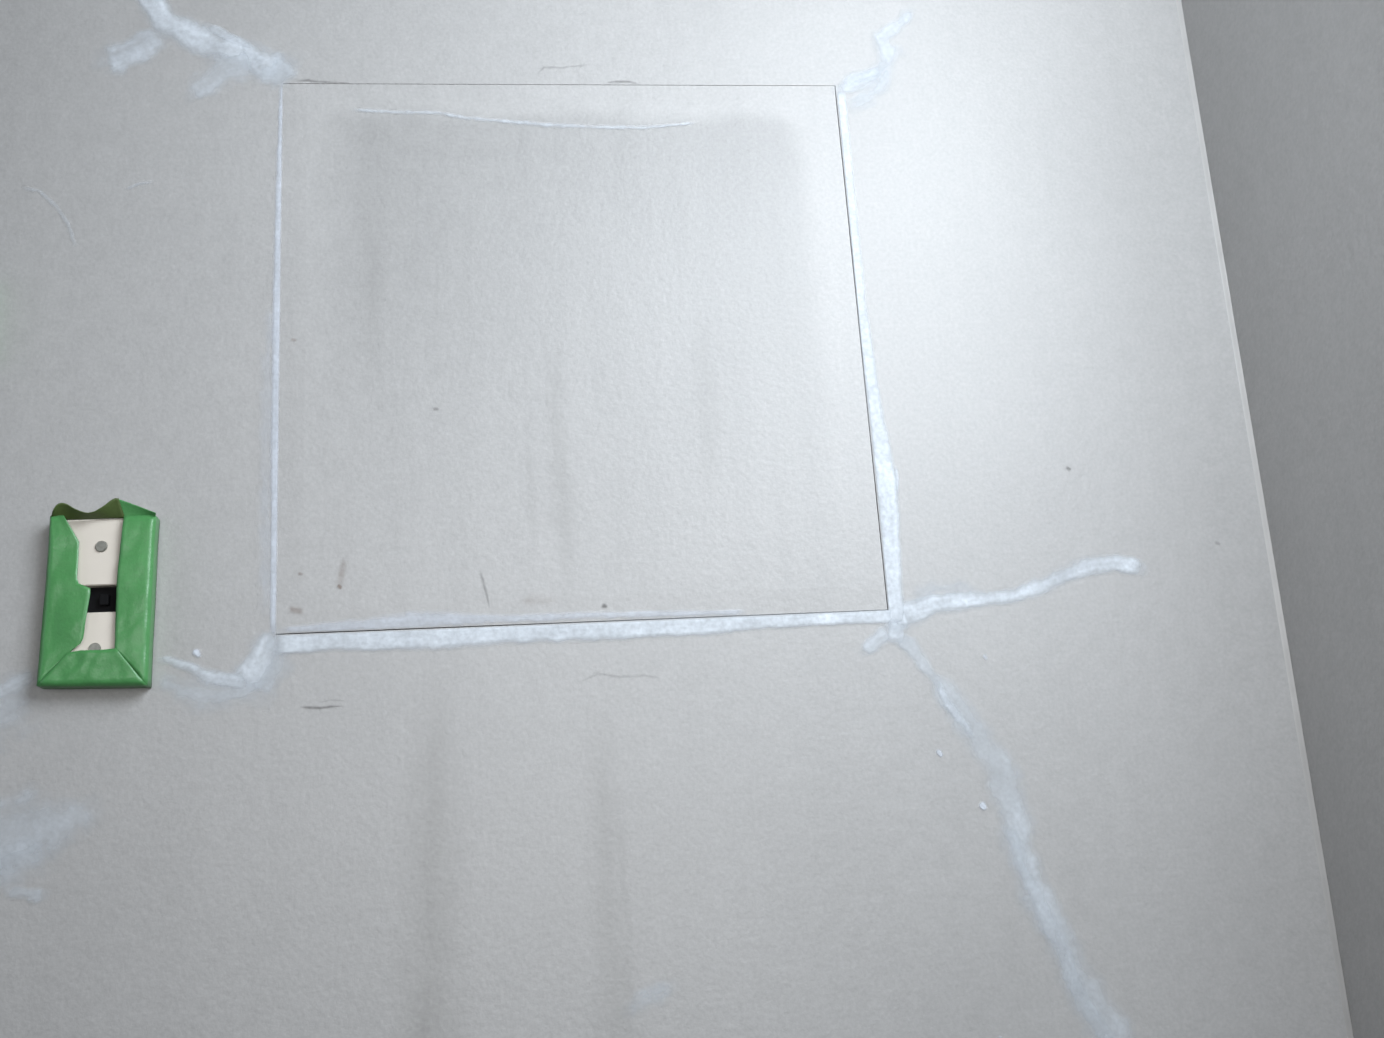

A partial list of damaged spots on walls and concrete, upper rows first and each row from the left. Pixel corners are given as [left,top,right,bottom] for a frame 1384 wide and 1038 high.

crack [110,0,292,95]
crack [844,15,910,91]
crack [165,634,276,698]
crack [864,556,1139,730]
crack [1005,790,1125,1038]